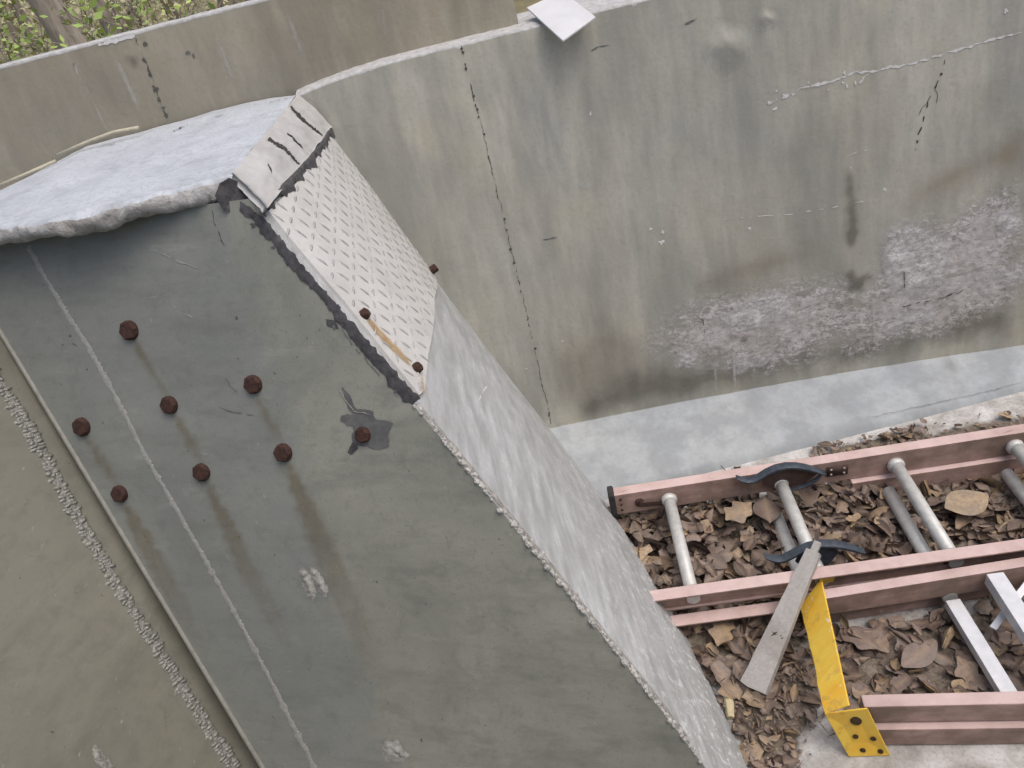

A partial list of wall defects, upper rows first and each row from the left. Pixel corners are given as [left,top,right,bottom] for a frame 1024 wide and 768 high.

crack [460,46,551,422]
crack [915,61,945,150]
peeling [239,201,703,764]